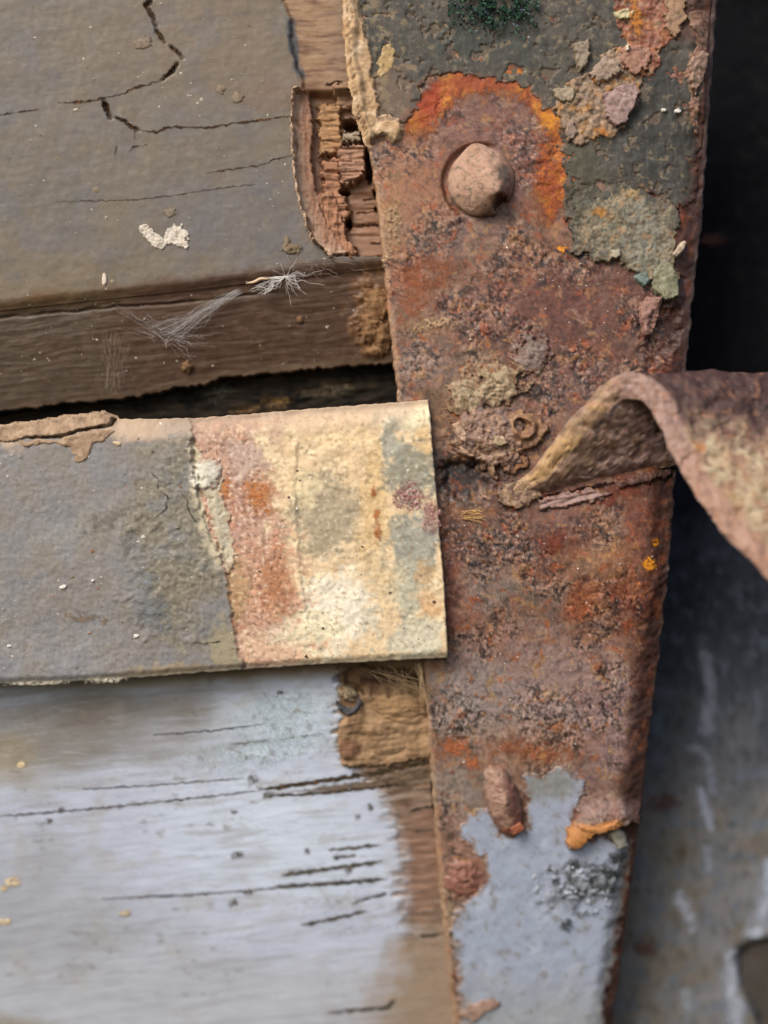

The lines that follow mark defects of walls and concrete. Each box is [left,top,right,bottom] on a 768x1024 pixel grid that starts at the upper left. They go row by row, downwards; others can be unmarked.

crack [63,1,289,153]
rust [405,0,709,219]
peeling [342,0,712,303]
rust [639,297,662,338]
spalling [0,410,122,463]
rust [393,480,441,533]
rust [495,467,673,512]
crack [10,760,430,816]
rust [565,785,644,851]
crack [109,844,386,926]
peeling [449,764,634,1024]
crack [328,1000,395,1014]